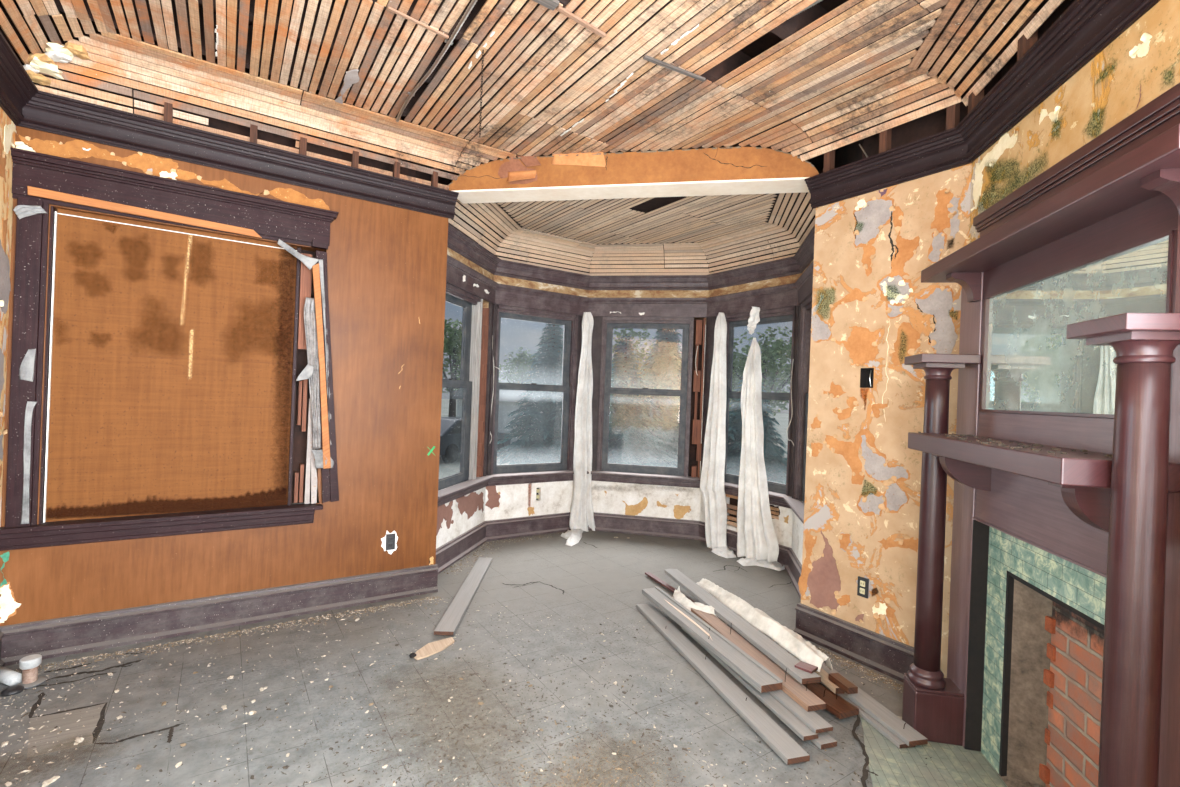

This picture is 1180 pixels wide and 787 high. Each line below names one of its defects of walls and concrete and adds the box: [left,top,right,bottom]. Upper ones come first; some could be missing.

peeling [0,121,330,210]
damp [978,157,1046,211]
peeling [0,219,11,314]
crack [888,212,899,269]
peeling [810,130,1018,366]
peeling [811,381,911,516]
peeling [0,552,21,624]
spalling [381,531,398,554]
peeling [436,486,501,536]
peeling [798,530,896,623]
crack [25,652,144,690]
crack [852,715,878,787]